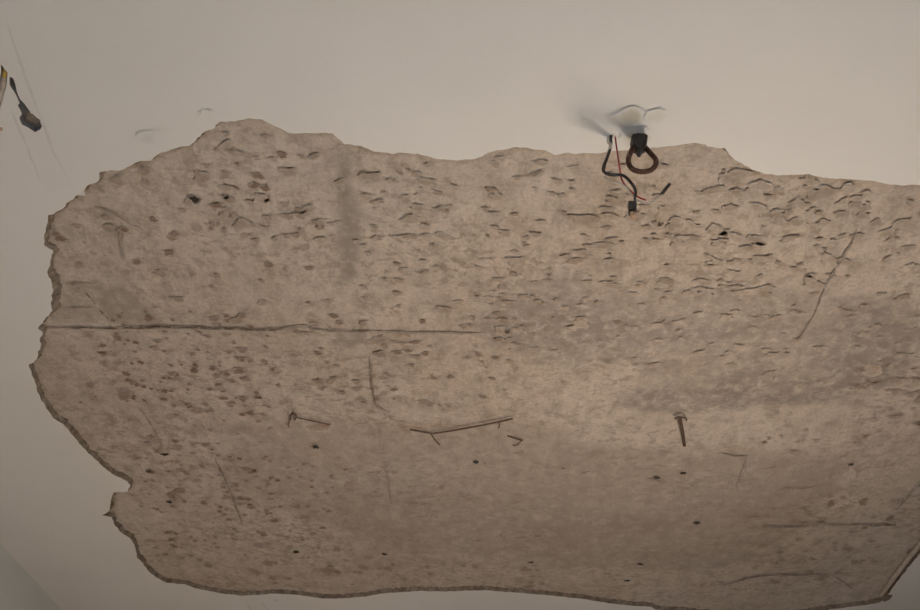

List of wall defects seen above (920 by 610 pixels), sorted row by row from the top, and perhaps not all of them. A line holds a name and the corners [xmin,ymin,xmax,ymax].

crack [46,283,476,337]
flaking render [29,118,920,610]